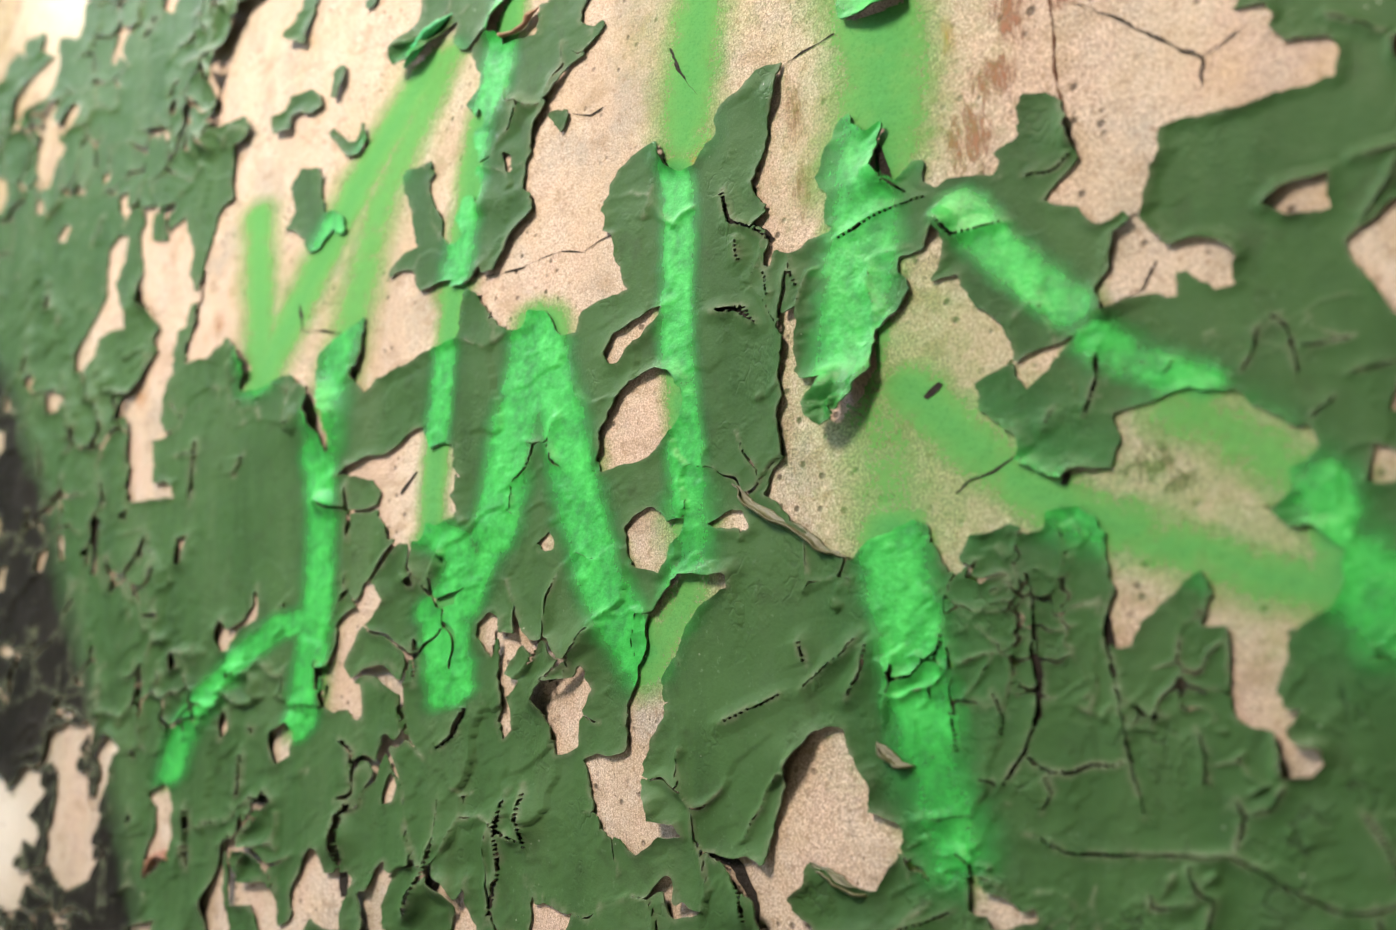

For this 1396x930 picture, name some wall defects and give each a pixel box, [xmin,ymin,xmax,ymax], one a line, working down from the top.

peeling [75,0,683,502]
crack [838,143,1000,238]
peeling [692,0,1339,308]
crack [1026,155,1069,176]
crack [1047,0,1246,112]
peeling [339,427,459,551]
peeling [711,224,1073,579]
peeling [0,714,118,930]
peeling [204,830,402,930]
peeling [539,666,680,855]
peeling [703,726,909,930]
peeling [1106,551,1323,779]